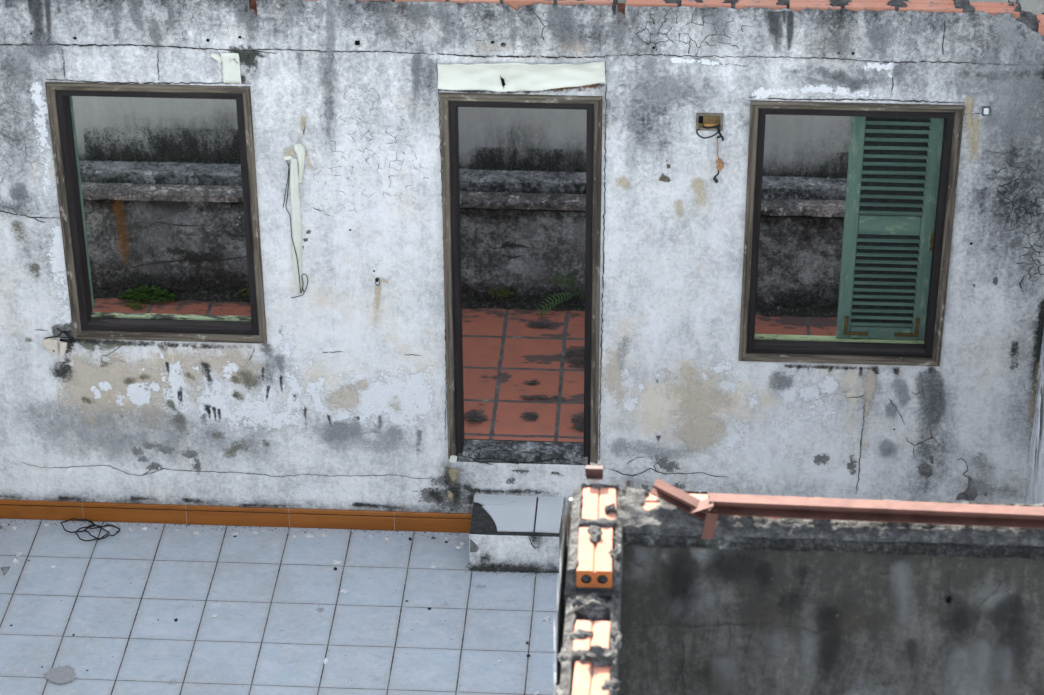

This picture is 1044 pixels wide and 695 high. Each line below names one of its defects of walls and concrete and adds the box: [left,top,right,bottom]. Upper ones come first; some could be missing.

leakage [14,0,62,106]
leakage [973,16,1044,149]
peeling [29,81,435,443]
crack [0,2,1044,491]
leakage [52,338,238,382]
spalling [132,441,201,475]
leakage [167,362,212,432]
leakage [202,405,222,439]
leakage [232,344,307,420]
leakage [770,365,879,390]
leakage [881,442,893,456]
leakage [886,367,945,454]